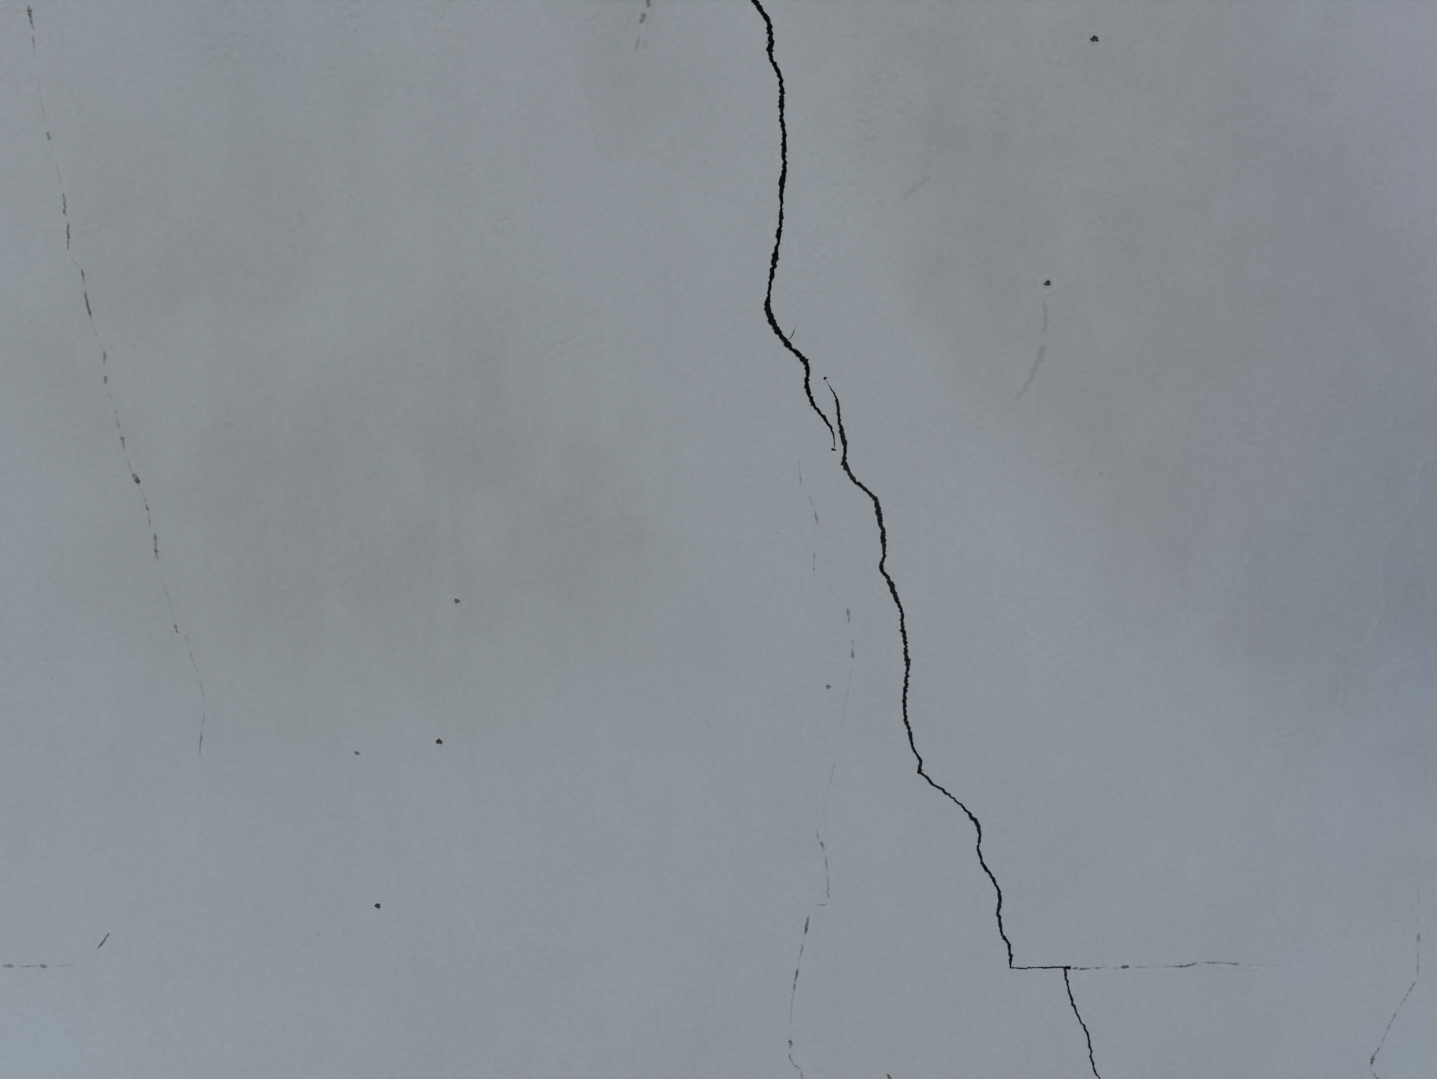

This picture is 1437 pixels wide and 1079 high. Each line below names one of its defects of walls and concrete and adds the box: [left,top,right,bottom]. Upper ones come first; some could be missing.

crack [747,0,1103,1079]